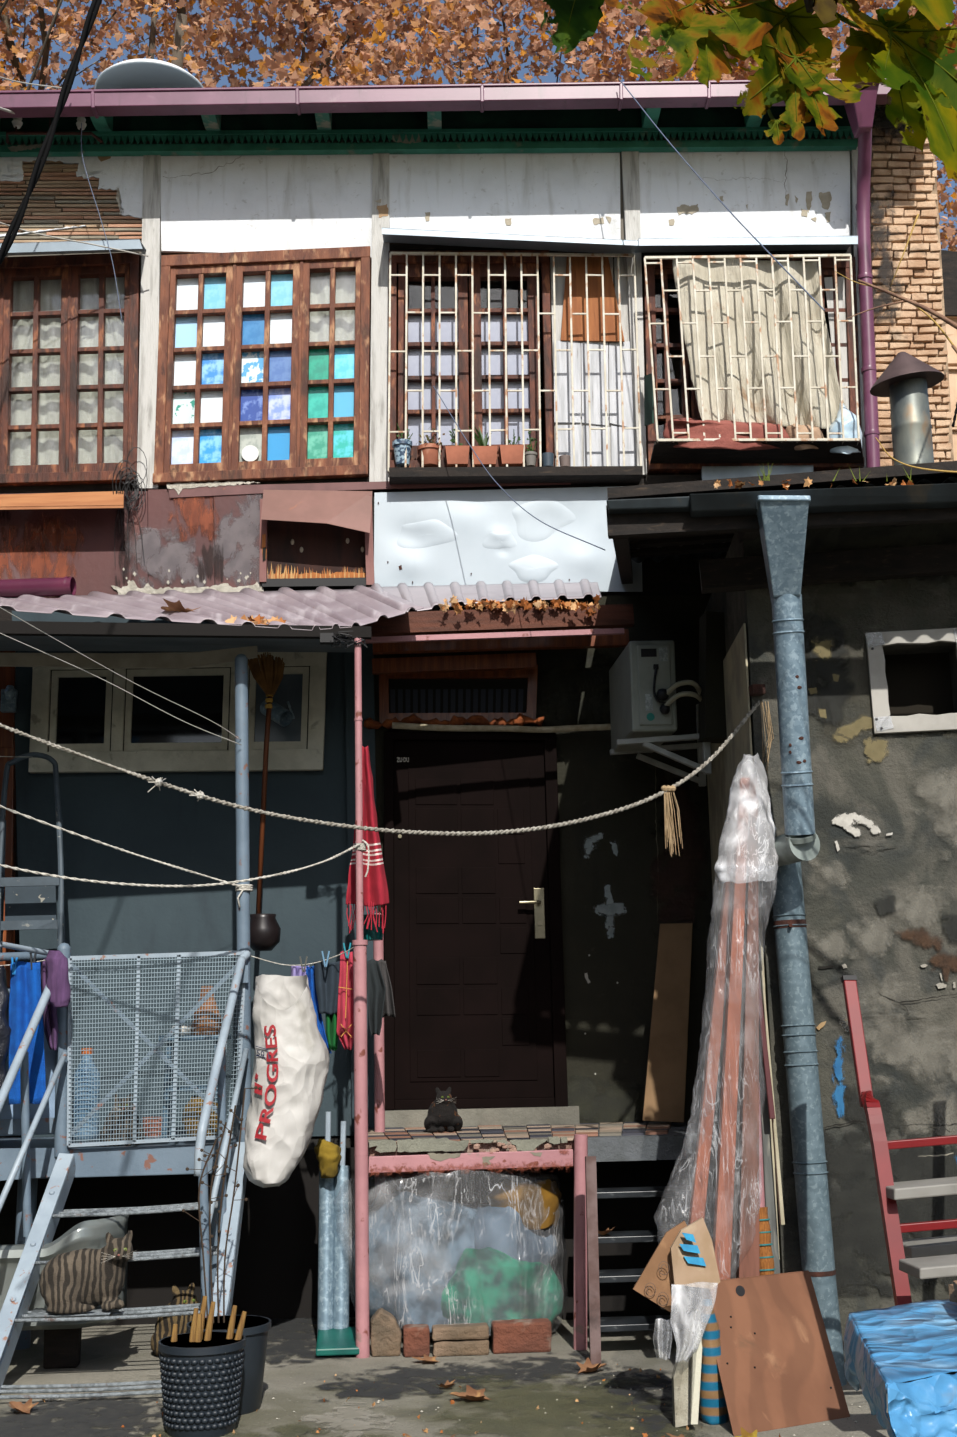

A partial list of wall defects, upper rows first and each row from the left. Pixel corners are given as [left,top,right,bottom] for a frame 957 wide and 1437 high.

flaking render [0,144,142,243]
peeling [785,191,832,222]
rust [0,527,76,579]
rust [124,494,262,588]
water stain [803,613,889,763]
water stain [917,768,957,845]
water stain [809,812,893,885]
water stain [811,887,957,959]